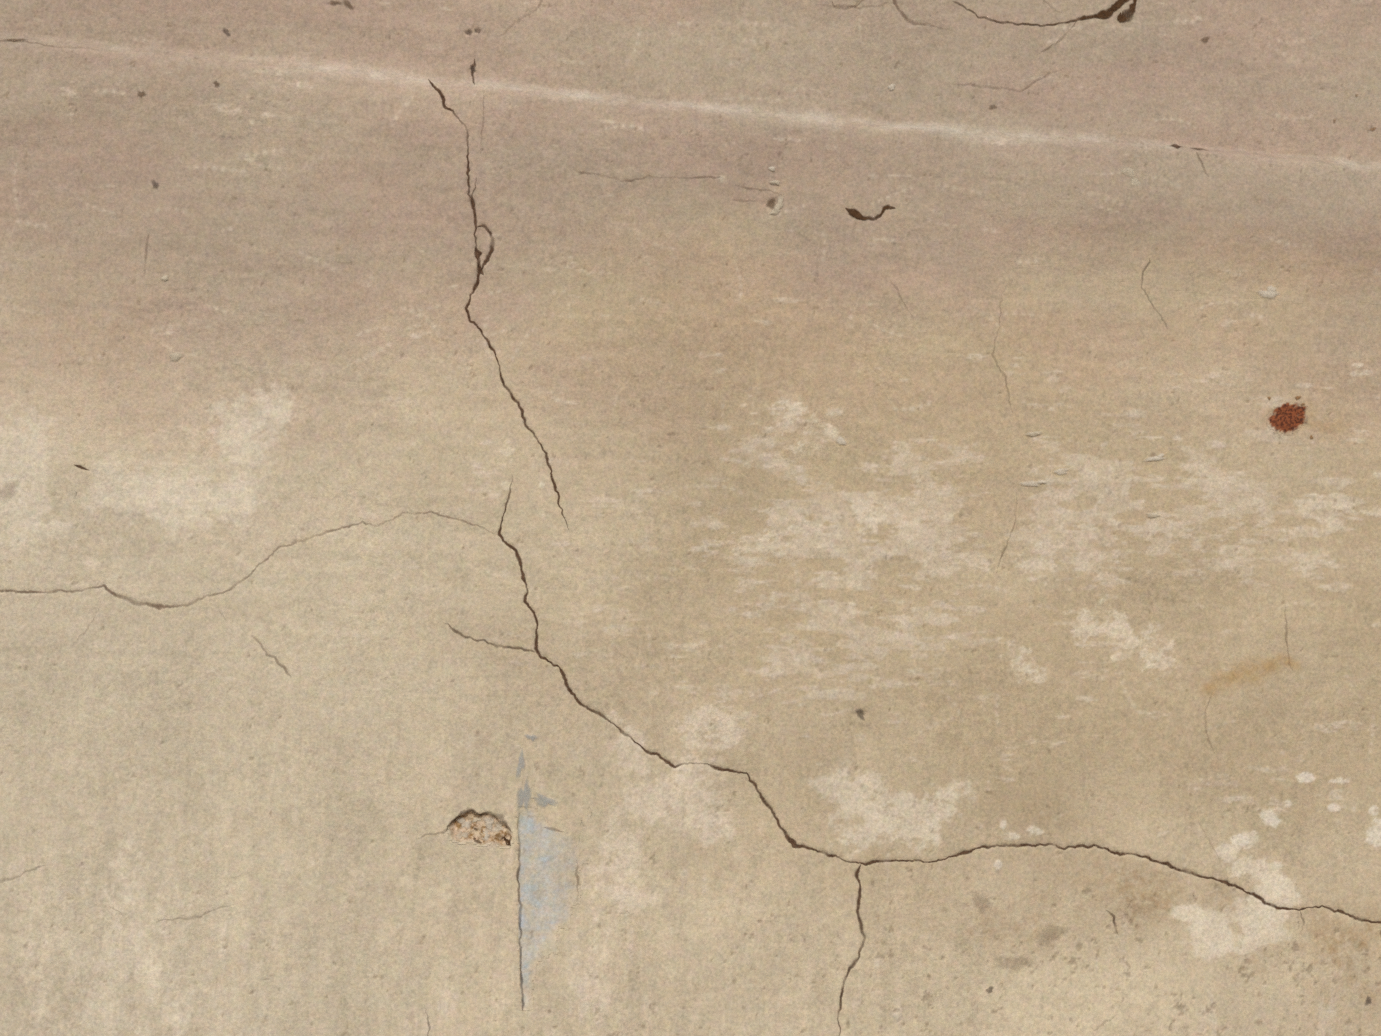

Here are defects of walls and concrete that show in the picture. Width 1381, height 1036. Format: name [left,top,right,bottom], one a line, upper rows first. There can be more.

crack [954,0,1137,26]
crack [428,58,568,527]
crack [846,205,895,220]
rust [1267,396,1313,439]
peeling [447,696,1049,1011]
crack [452,492,1381,1032]